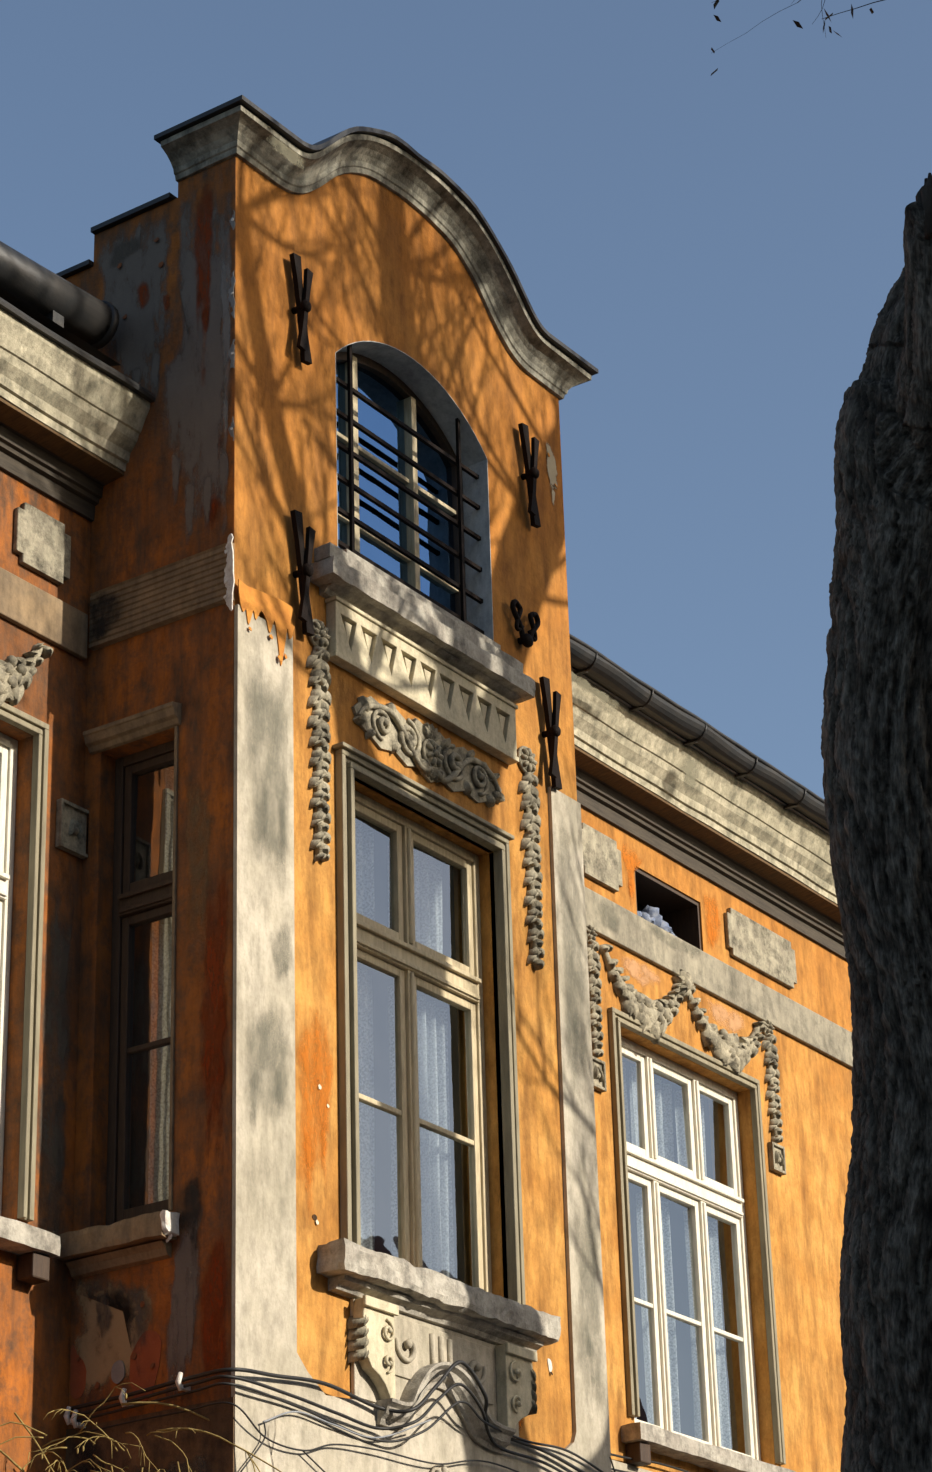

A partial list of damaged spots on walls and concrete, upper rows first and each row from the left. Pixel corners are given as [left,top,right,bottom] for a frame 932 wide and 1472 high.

spalling [228,271,236,318]
peeling [546,444,558,504]
peeling [223,533,296,666]
flaking render [75,1282,154,1392]